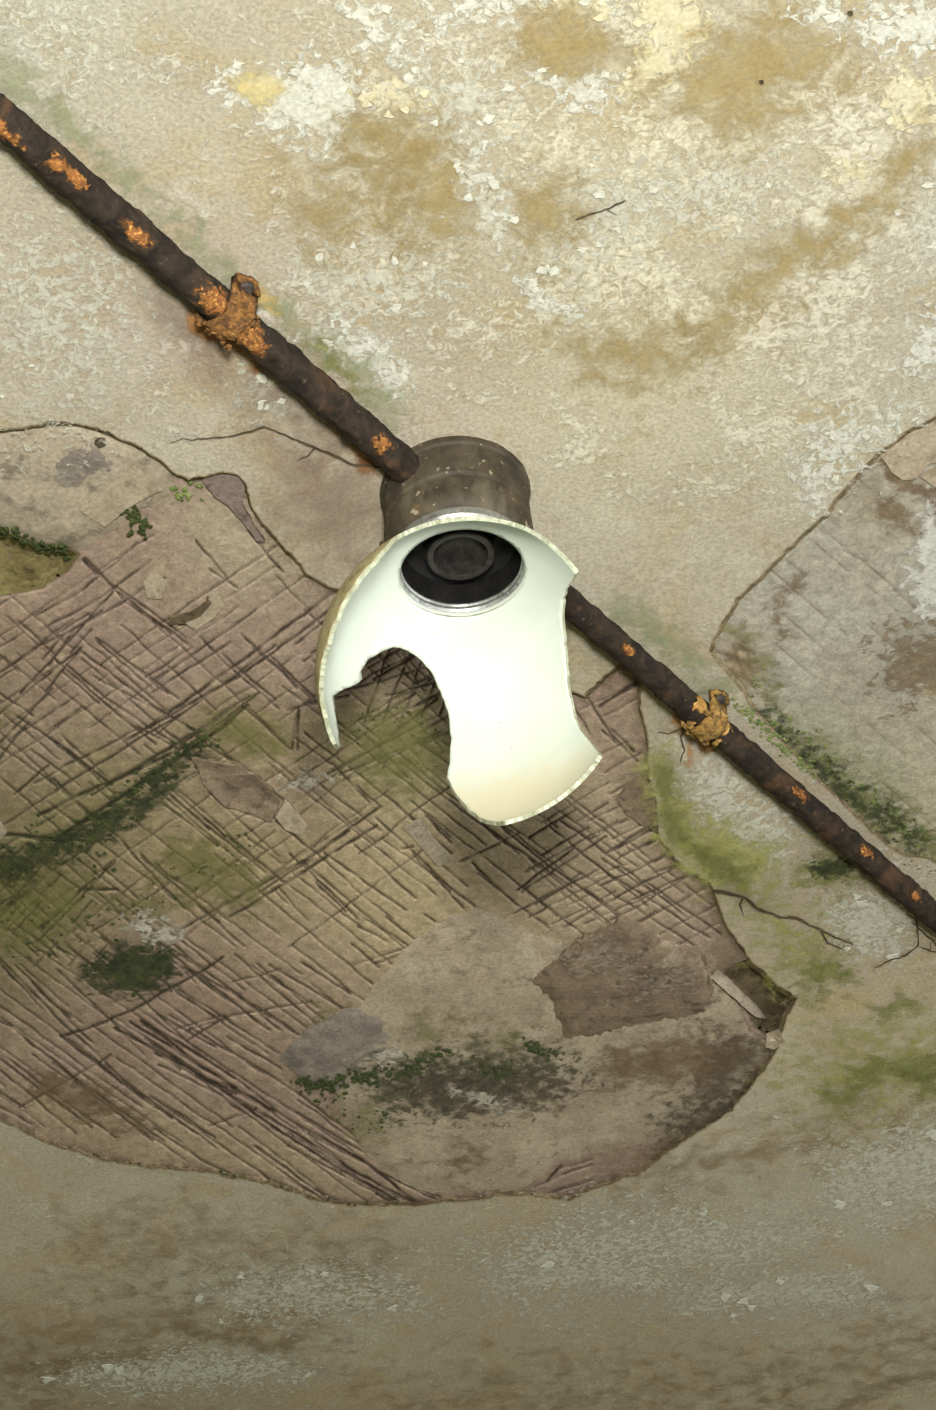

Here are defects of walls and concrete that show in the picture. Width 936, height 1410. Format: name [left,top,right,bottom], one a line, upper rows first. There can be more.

water stain [680,14,856,136]
rust [45,151,90,190]
water stain [342,111,463,237]
rust [125,219,154,248]
water stain [679,141,934,349]
rust [188,282,283,374]
crack [172,426,380,468]
flaking render [0,0,936,863]
rust [671,695,733,765]
peeling [657,730,829,900]
crack [712,889,936,968]
peeling [799,878,936,987]